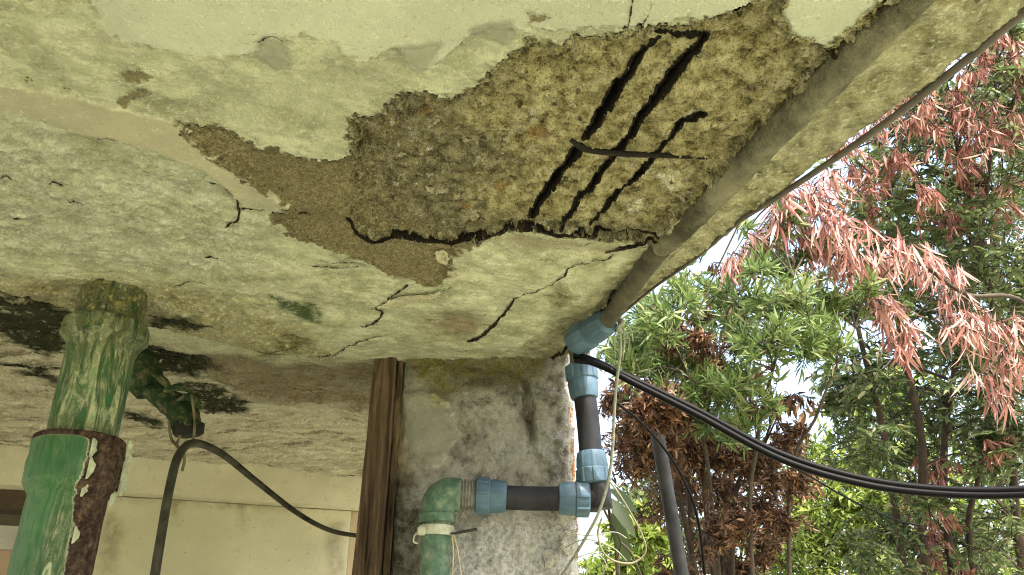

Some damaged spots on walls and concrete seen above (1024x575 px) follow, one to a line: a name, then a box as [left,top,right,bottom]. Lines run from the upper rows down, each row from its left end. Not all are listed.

spalling [173,0,901,309]
mould [0,291,72,384]
damp [147,315,208,330]
crack [319,285,408,358]
crack [467,238,616,342]
crack [550,345,568,360]